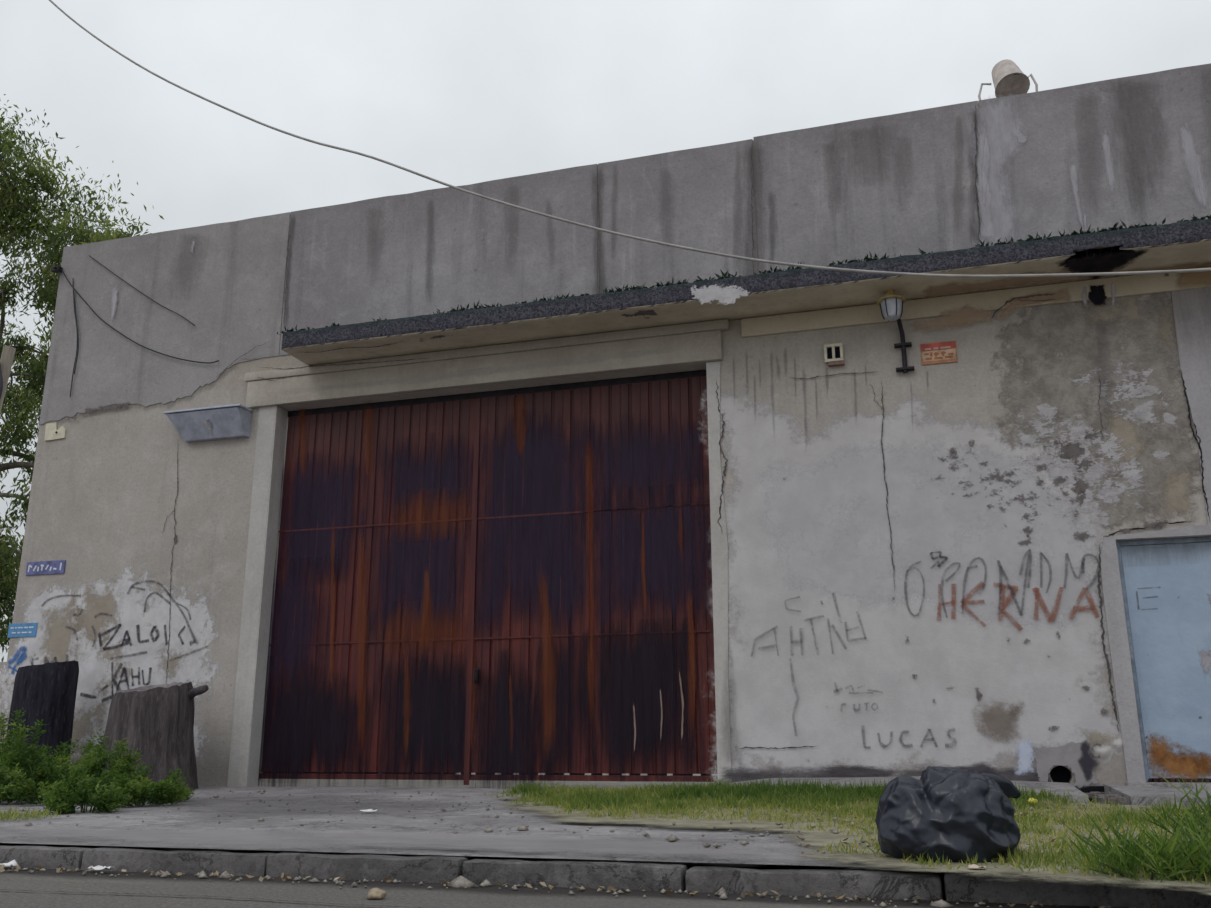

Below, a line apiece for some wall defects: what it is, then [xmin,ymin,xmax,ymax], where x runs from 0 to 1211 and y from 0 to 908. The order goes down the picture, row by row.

leakage [969,100,1027,245]
leakage [1103,134,1115,188]
leakage [1181,129,1206,206]
spalling [689,284,750,305]
leakage [925,263,1211,297]
crack [715,382,728,530]
crack [799,371,895,600]
peeling [714,283,1201,781]
crack [1097,369,1210,732]
peeling [0,566,221,764]
peeling [586,493,711,775]
rust [1146,737,1211,782]